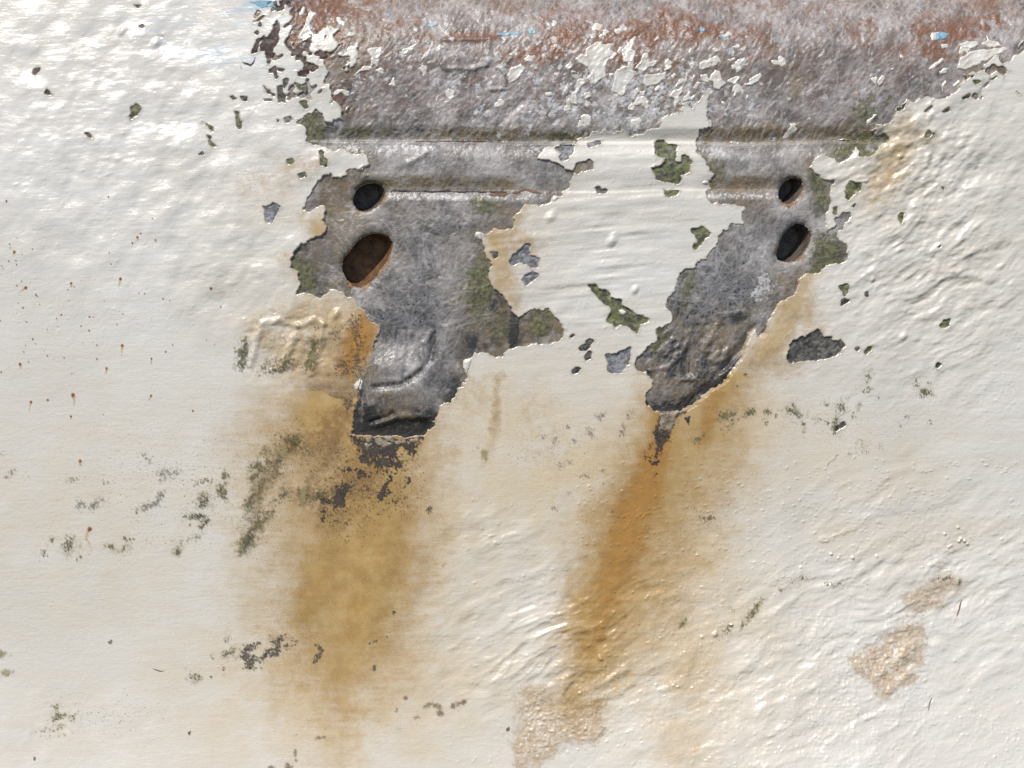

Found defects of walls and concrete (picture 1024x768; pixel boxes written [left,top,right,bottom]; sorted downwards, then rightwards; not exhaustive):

peeling [251,0,1024,438]
leakage [135,453,179,514]
leakage [193,472,230,508]
leakage [263,418,425,550]
rust [290,309,423,690]
rust [571,373,744,695]